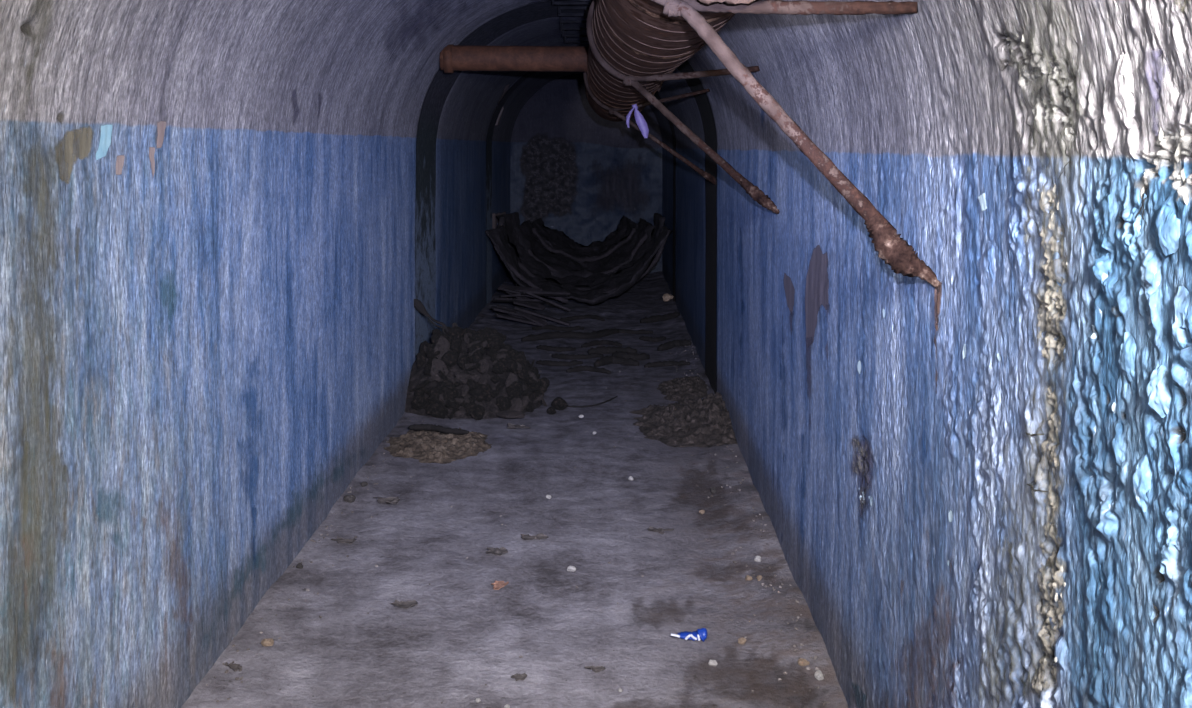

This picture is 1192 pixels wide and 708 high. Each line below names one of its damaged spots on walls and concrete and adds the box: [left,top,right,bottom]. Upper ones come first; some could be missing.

spalling [1002,34,1079,137]
peeling [55,112,125,183]
peeling [149,121,166,176]
spalling [1138,127,1192,205]
leakage [852,439,873,516]